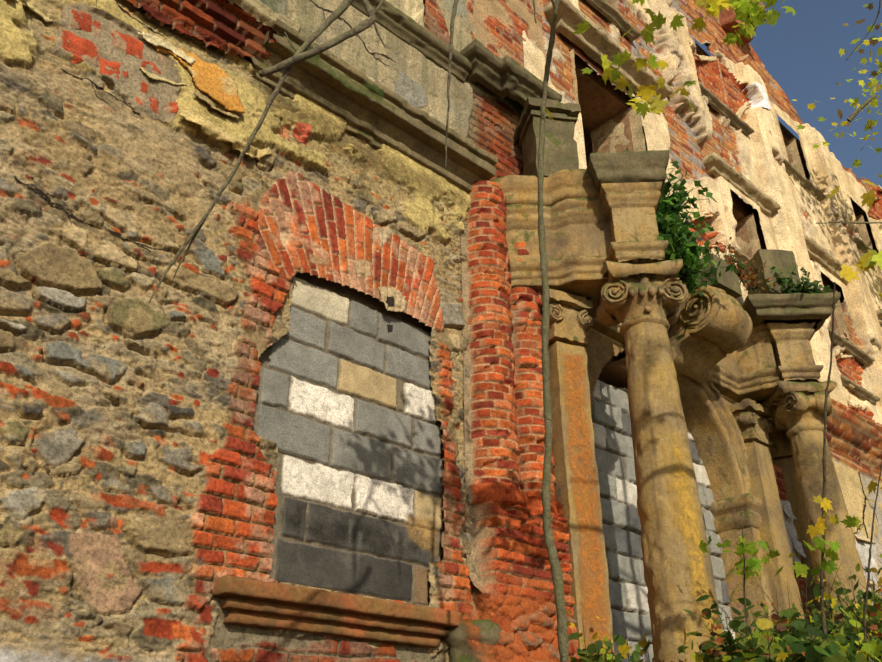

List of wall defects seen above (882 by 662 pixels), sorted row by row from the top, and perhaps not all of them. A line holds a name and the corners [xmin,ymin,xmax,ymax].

spalling [127,0,301,60]
crack [310,0,396,66]
flaking render [14,0,272,160]